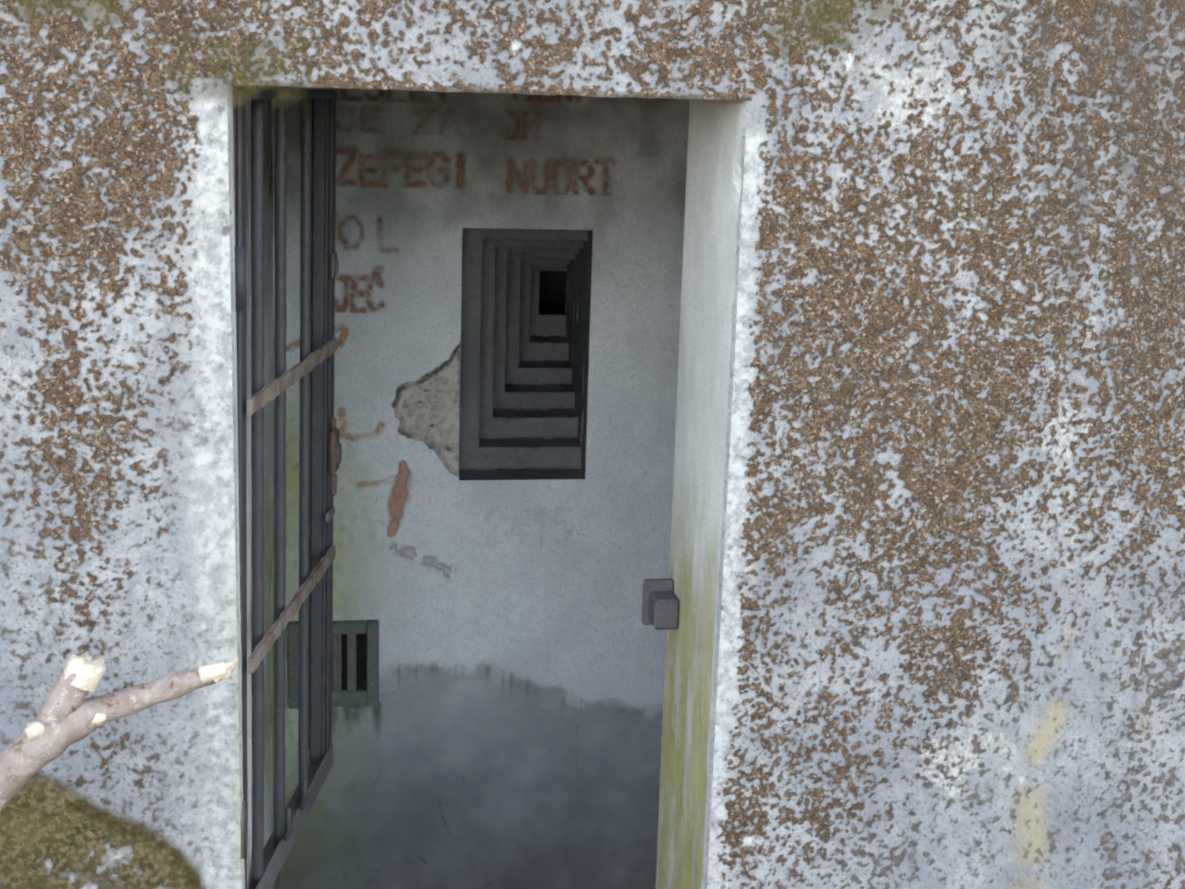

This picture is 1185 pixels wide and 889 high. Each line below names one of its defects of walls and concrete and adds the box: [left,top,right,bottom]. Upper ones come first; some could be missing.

flaking render [392,344,460,476]
water stain [349,673,662,889]